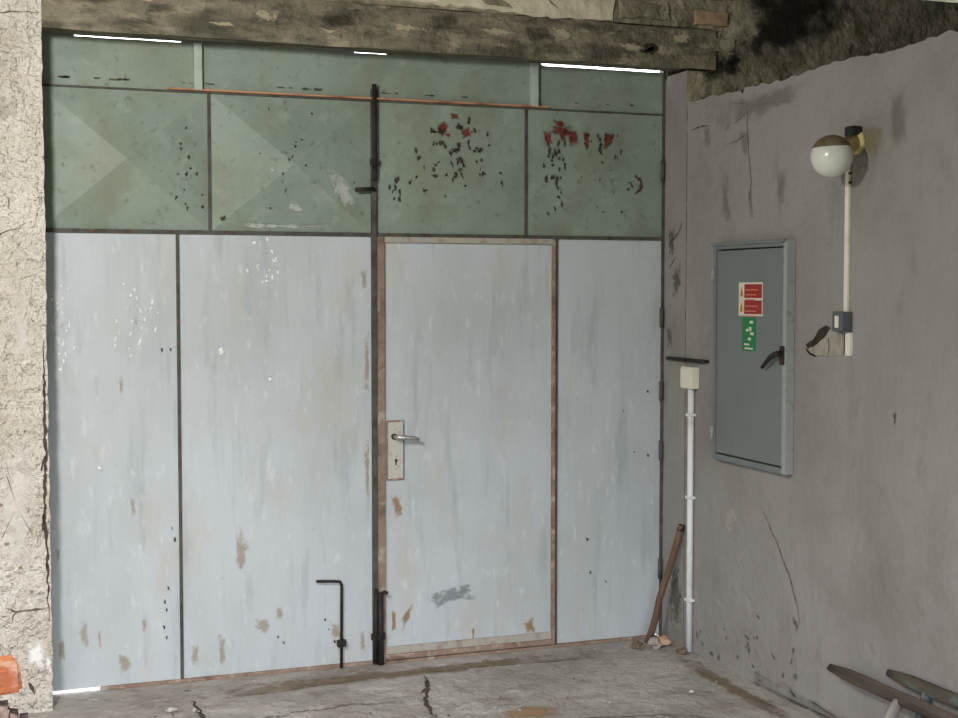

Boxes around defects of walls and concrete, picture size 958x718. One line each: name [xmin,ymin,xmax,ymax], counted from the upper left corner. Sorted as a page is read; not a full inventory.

peeling [256,11,278,21]
peeling [382,0,670,39]
flaking render [673,0,735,53]
water stain [749,0,847,54]
peeling [617,43,641,51]
water stain [703,54,740,78]
peeling [388,114,491,202]
peeling [543,121,622,215]
crack [191,701,205,718]
crack [265,675,434,718]
crack [587,710,711,718]